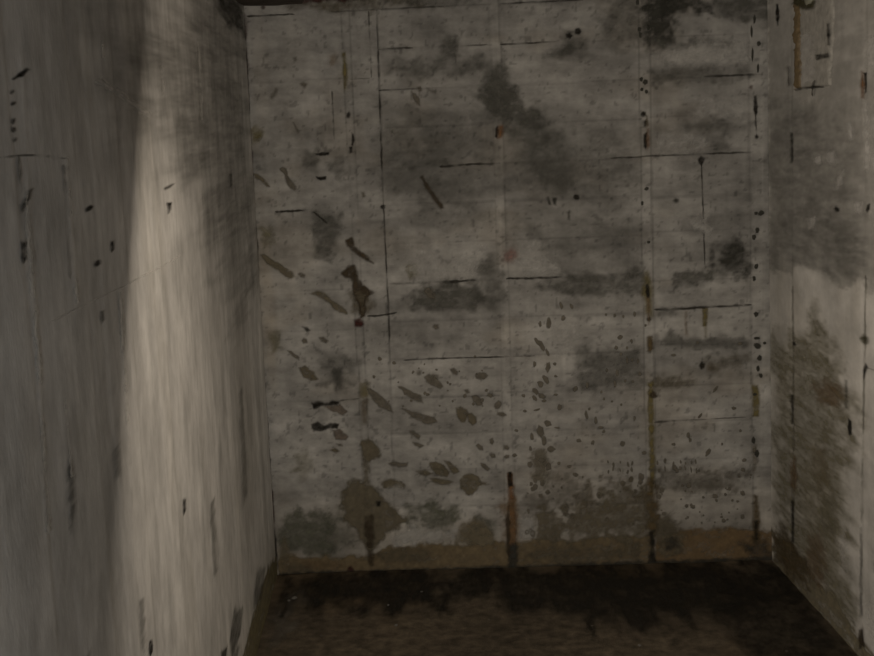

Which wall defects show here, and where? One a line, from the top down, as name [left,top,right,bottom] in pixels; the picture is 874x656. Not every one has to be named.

leakage [478,64,549,150]
rust [500,472,519,568]
leakage [222,326,874,656]